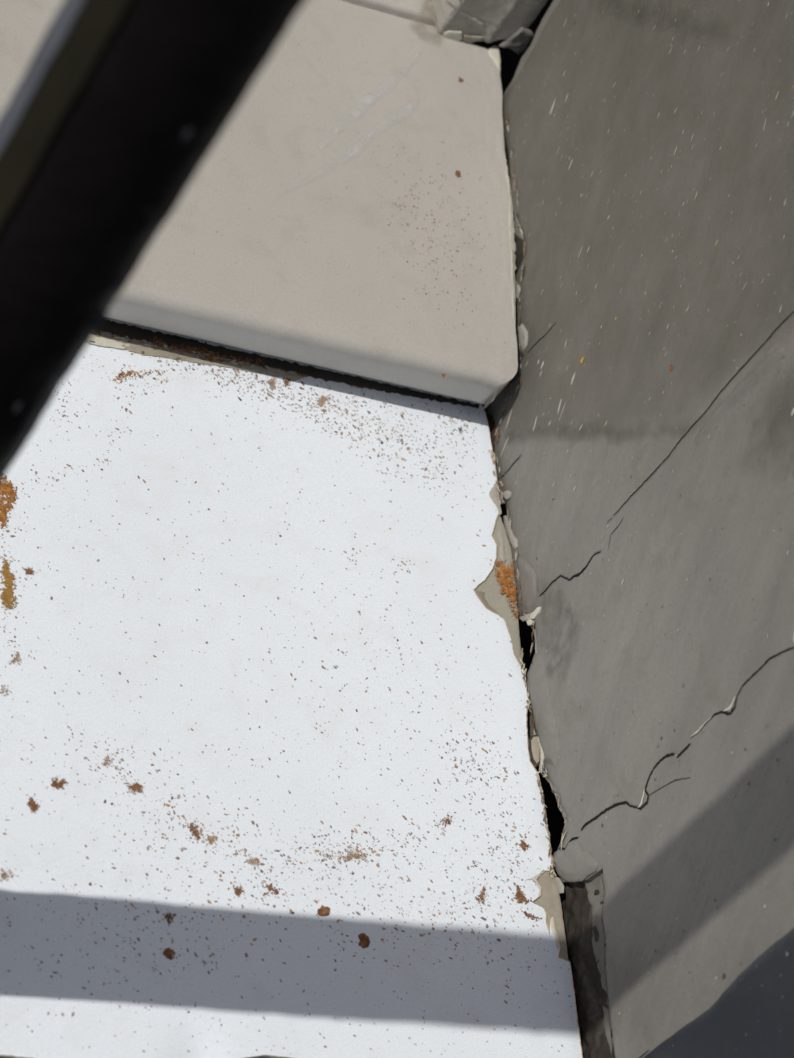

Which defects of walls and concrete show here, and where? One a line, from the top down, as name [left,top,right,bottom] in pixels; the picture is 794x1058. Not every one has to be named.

peeling [511,147,526,328]
rust [0,475,19,532]
rust [0,548,41,609]
rust [490,557,519,619]
crack [539,311,794,597]
spalling [475,409,615,1058]
crack [559,635,794,850]